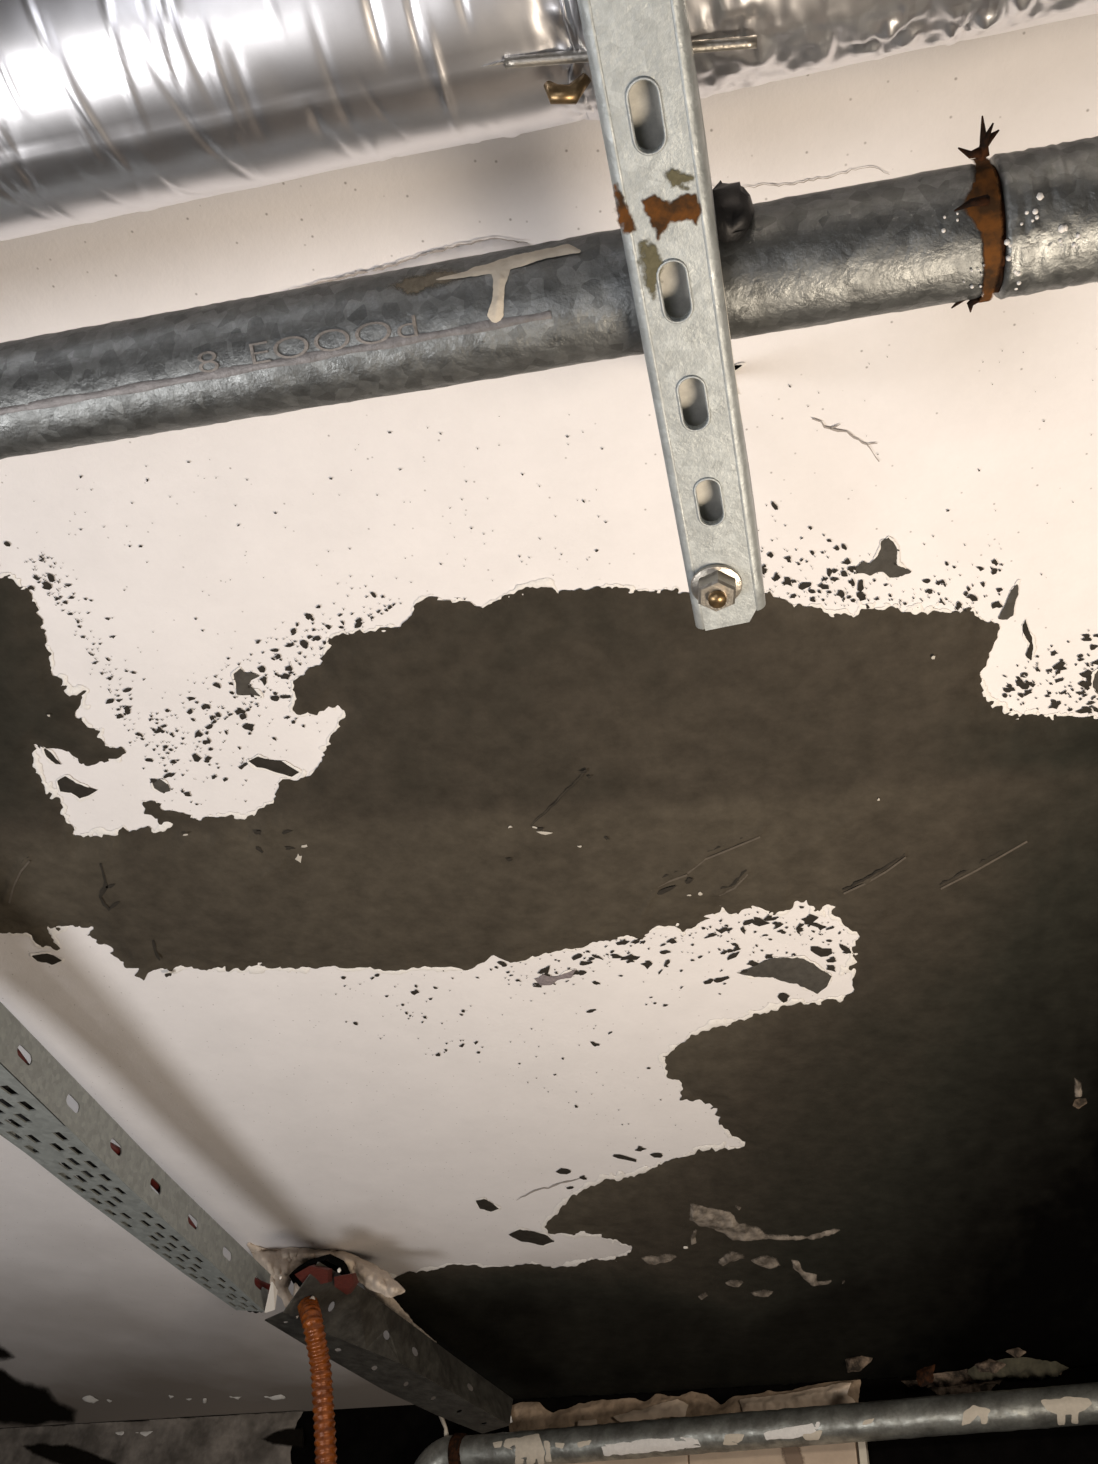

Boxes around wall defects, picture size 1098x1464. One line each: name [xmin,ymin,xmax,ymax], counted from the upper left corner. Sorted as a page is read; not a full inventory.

crack [812,418,879,462]
flaking render [0,527,1098,1432]